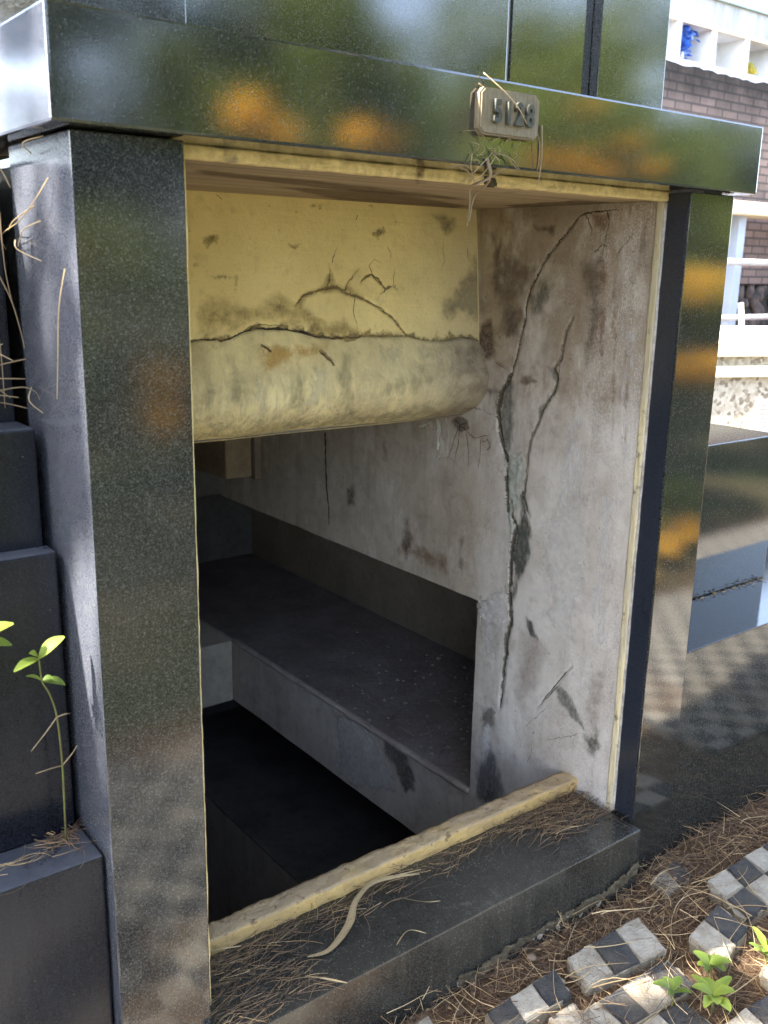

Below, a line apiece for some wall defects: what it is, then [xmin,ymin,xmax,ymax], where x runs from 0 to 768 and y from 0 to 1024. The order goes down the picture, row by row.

crack [190,248,479,366]
crack [322,433,330,523]
crack [449,209,633,708]
leakage [338,717,414,791]
leakage [477,709,503,803]